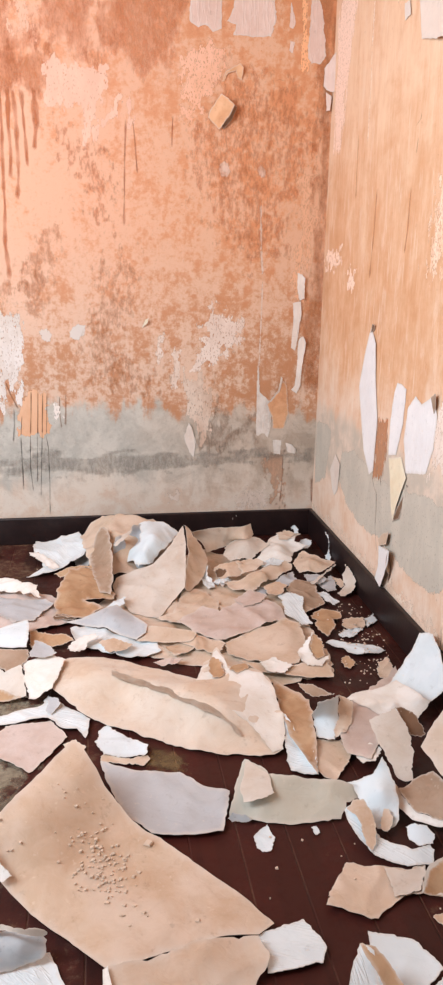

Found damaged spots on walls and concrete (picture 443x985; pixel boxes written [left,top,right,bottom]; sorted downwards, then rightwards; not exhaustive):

leakage [0,31,43,218]
peeling [301,0,310,72]